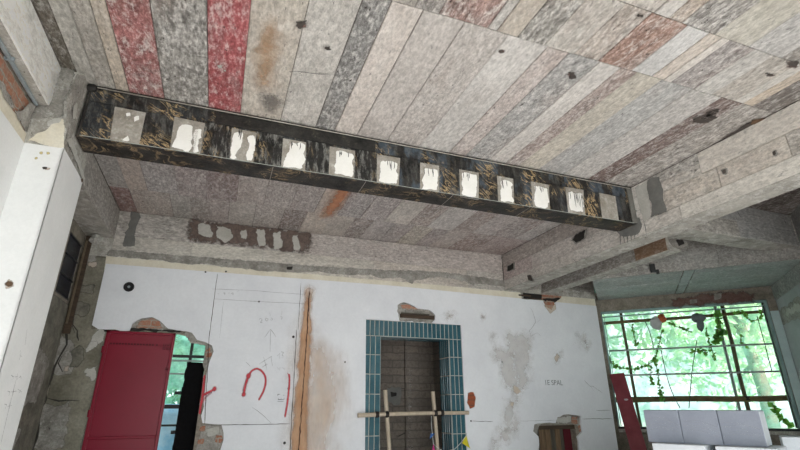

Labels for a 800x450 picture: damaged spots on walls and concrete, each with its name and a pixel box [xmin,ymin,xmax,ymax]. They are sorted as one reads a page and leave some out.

flaking render [0,51,85,183]
spalling [693,109,719,124]
flaking render [397,303,434,323]
flaking render [521,293,561,313]
flaking render [130,317,214,371]
corrosion [291,289,332,450]
flaking render [196,424,224,450]